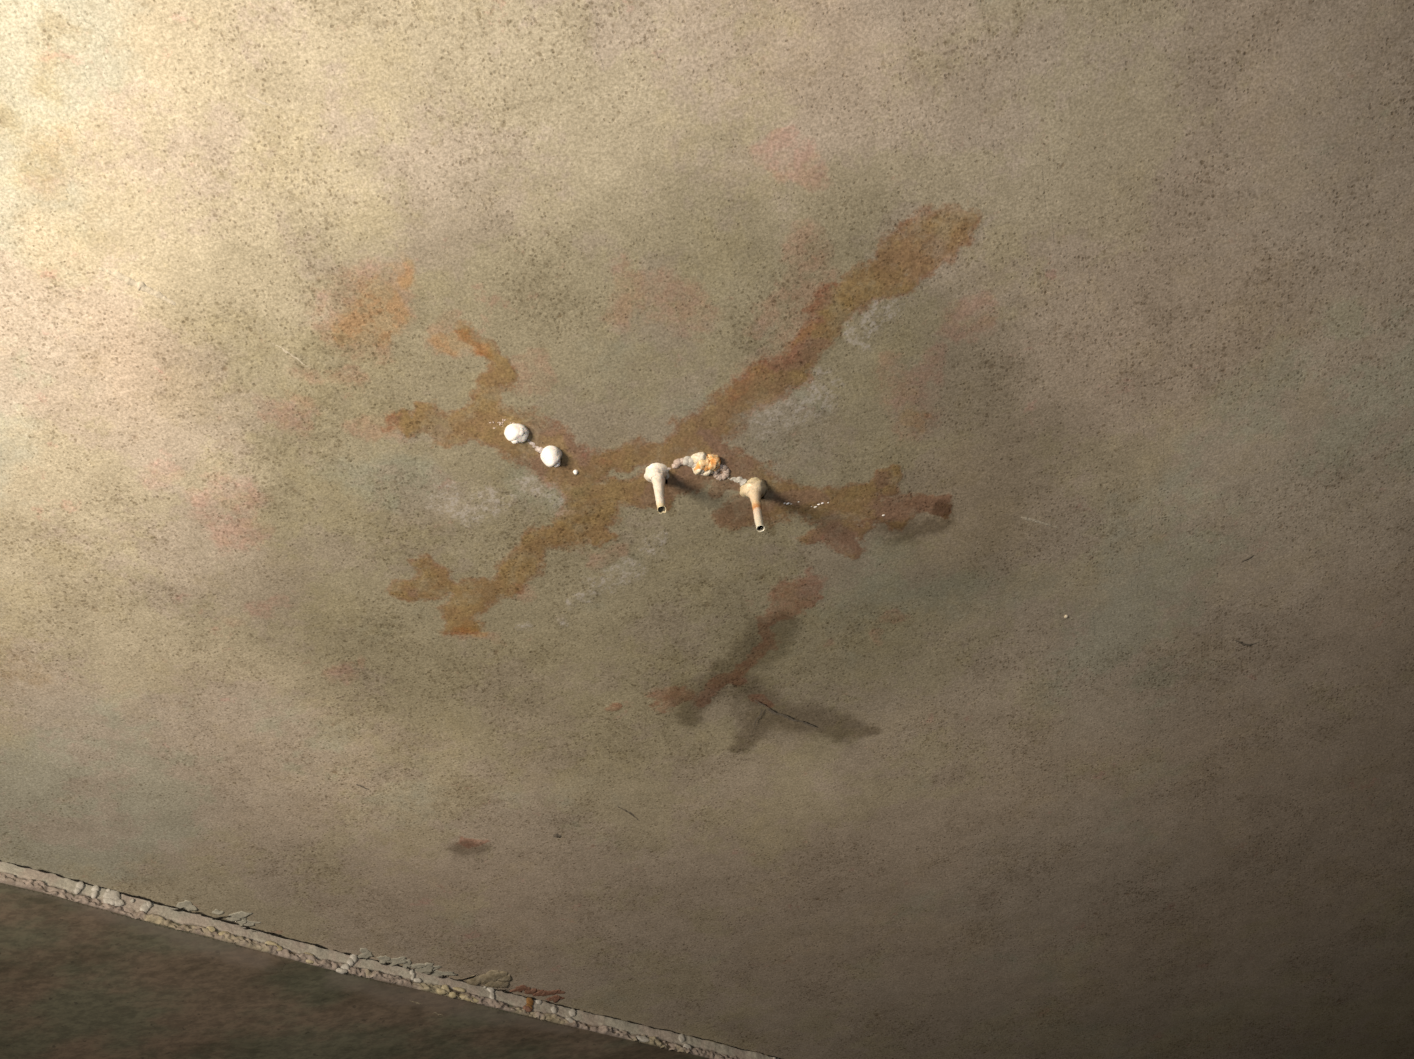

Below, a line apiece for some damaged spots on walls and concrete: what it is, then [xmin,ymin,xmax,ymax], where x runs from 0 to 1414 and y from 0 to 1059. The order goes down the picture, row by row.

rust [292,239,429,377]
leakage [86,43,1164,886]
rust [374,195,987,639]